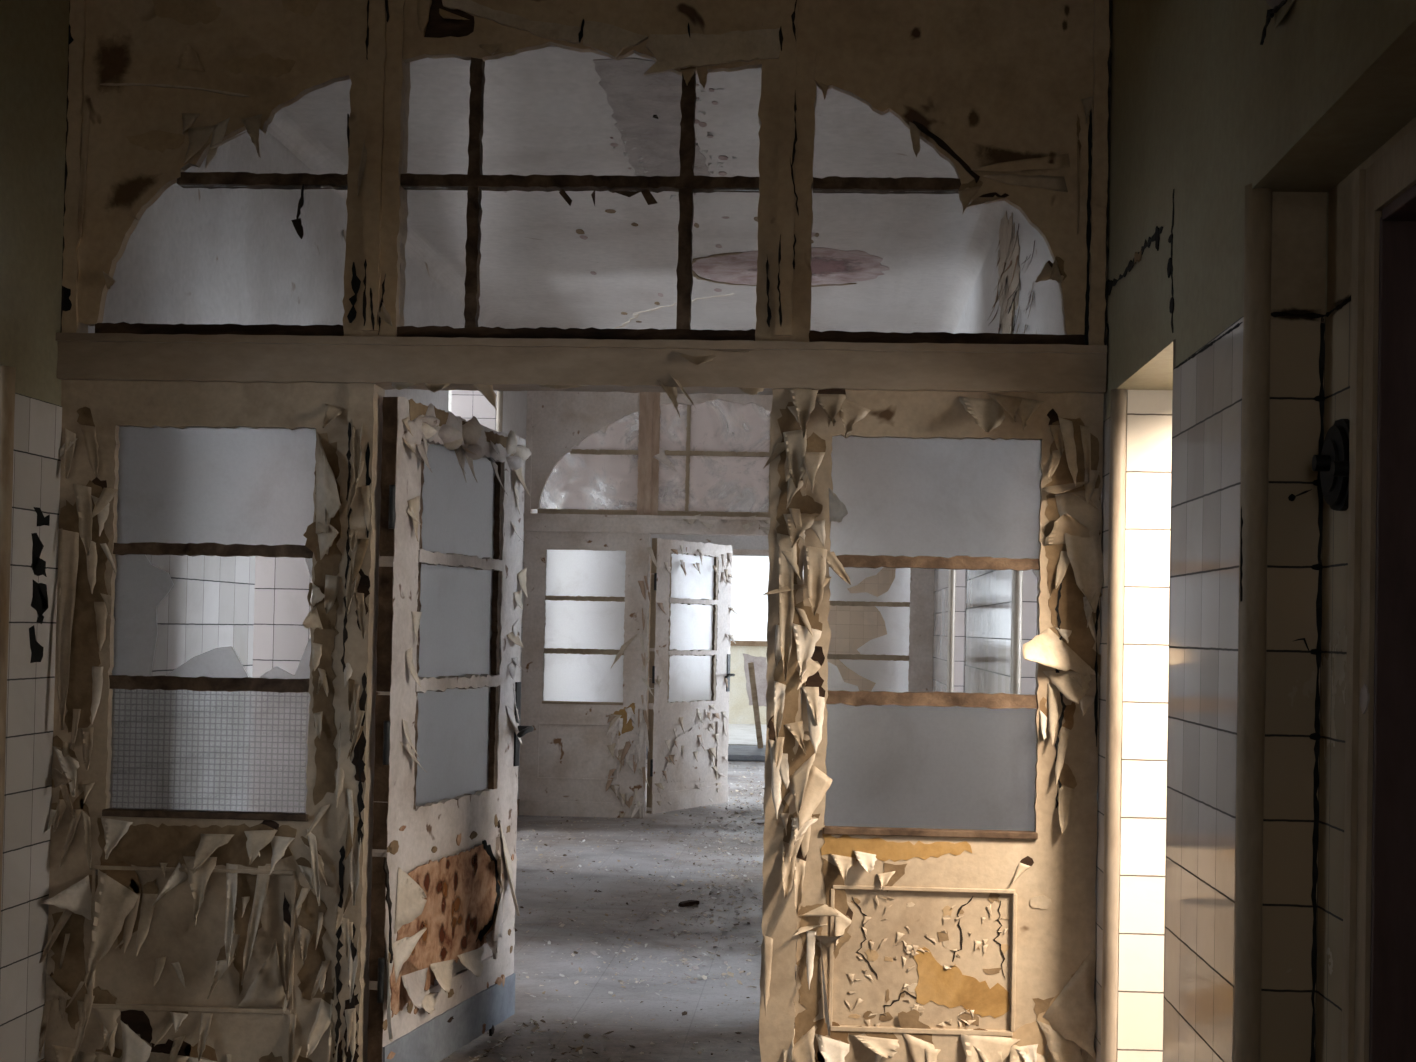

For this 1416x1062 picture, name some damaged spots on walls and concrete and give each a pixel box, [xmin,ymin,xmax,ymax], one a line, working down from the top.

crack [60,2,71,333]
spalling [61,286,72,311]
peeling [593,58,736,201]
peeling [909,96,1094,334]
crack [1084,0,1242,369]
peeling [39,404,372,1062]
peeling [391,382,531,542]
peeling [506,567,528,745]
peeling [606,545,734,819]
peeling [674,388,1104,1062]
crack [1237,507,1245,601]
peeling [382,814,520,1059]